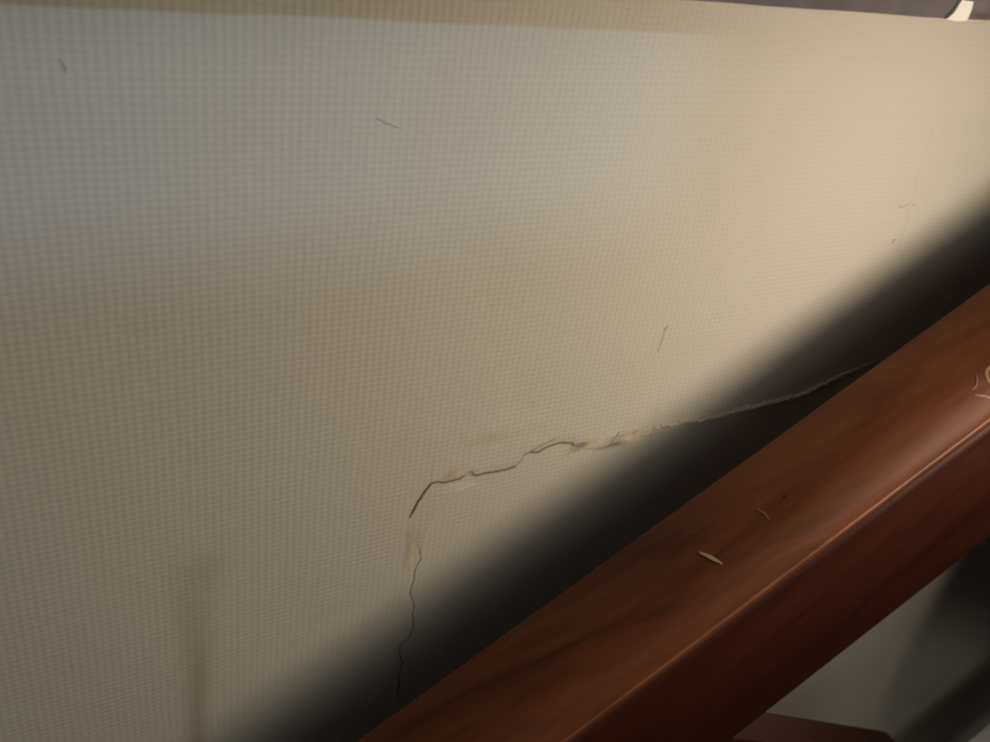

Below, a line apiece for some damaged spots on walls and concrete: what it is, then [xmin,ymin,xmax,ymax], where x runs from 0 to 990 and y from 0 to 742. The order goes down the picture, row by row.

crack [410,432,652,518]
crack [365,543,421,709]